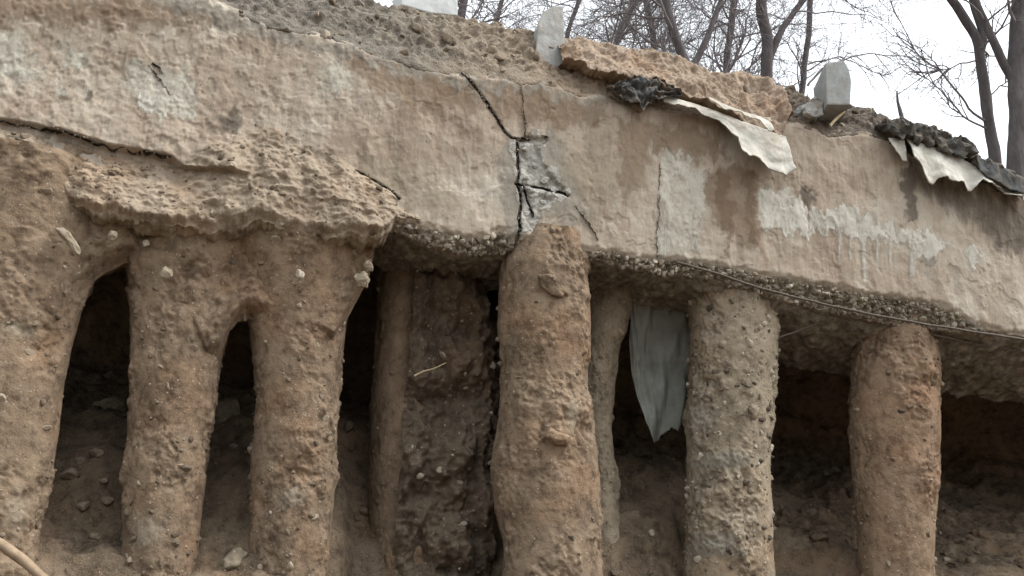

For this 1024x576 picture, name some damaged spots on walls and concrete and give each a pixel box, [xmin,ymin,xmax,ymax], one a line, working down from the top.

crack [149,62,170,97]
crack [0,120,171,159]
crack [355,169,400,200]
spalling [390,129,572,258]
leakage [498,136,522,238]
crack [461,72,598,242]
crack [654,163,662,260]
flaking render [663,95,797,176]
leakage [539,126,1024,282]
flaking render [888,138,1024,202]